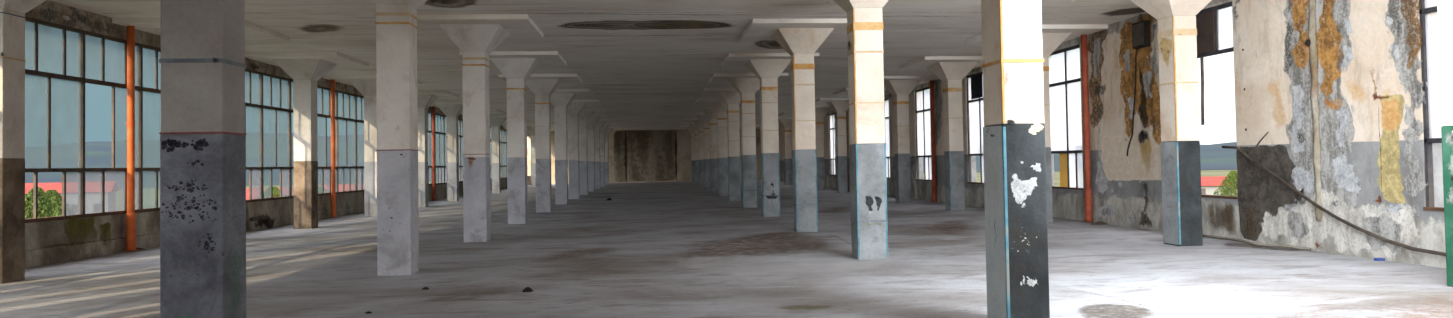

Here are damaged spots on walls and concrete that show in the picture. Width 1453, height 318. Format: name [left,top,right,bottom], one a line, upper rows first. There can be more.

peeling [1010,161,1041,207]
peeling [1087,14,1161,195]
peeling [1267,0,1368,208]
peeling [1383,0,1429,197]